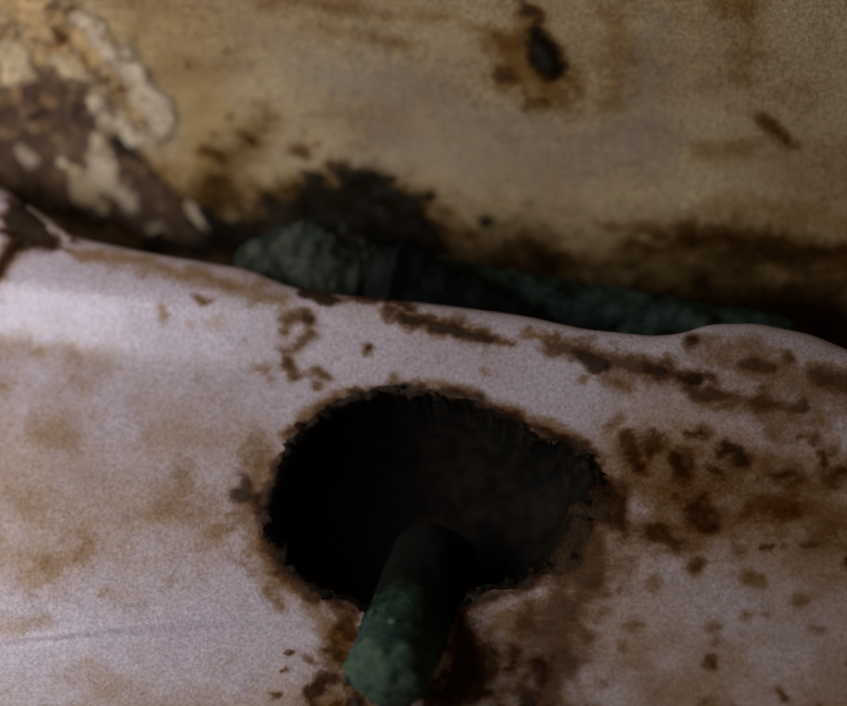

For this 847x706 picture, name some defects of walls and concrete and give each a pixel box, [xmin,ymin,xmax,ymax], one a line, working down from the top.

flaking render [0,0,258,254]
crack [0,215,20,273]
mould [138,159,443,267]
rust [279,309,312,380]
rust [297,289,512,345]
rust [545,334,729,402]
rust [620,429,661,471]
rust [715,440,750,467]
rust [229,382,627,638]
rust [302,671,355,706]